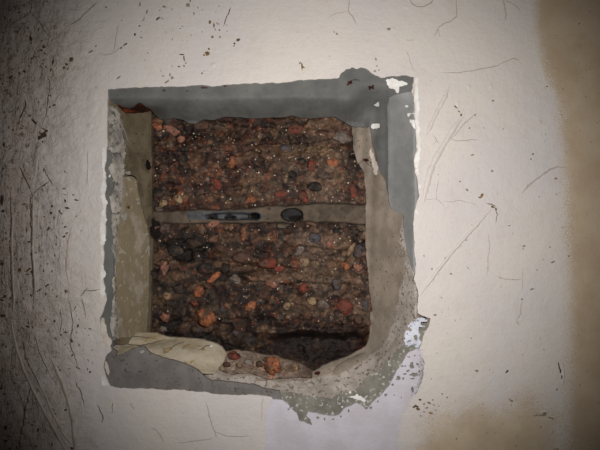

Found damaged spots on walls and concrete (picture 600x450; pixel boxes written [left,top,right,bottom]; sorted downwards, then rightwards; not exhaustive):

crack [7,192,15,312]
crack [19,167,53,302]
spalling [99,58,439,424]
crack [427,178,498,220]
crack [522,166,565,193]
crack [60,289,99,363]
crack [17,336,49,450]